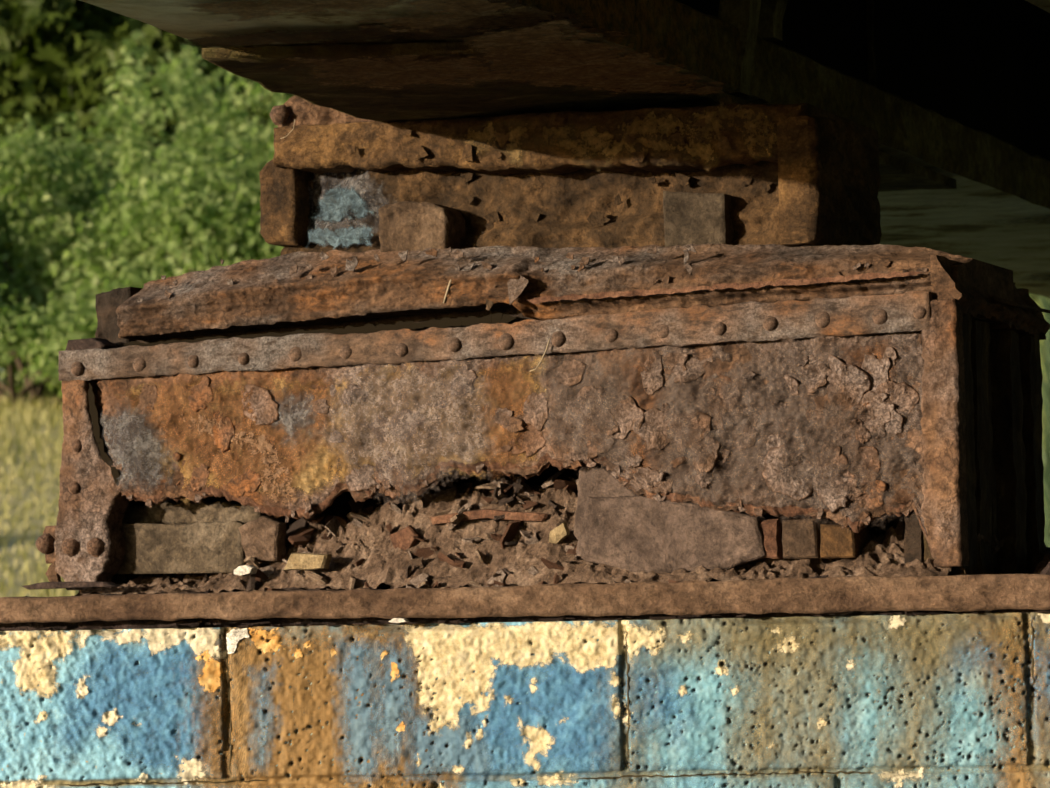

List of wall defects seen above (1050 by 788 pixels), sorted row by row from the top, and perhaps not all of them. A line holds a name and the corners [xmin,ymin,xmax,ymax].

corrosion [65,338,118,351]
crack [117,313,516,348]
corrosion [117,383,330,505]
peeling [345,464,403,499]
corrosion [549,521,570,544]
corrosion [22,561,140,594]
peeling [0,627,227,699]
peeling [404,620,666,749]
peeling [716,660,728,676]
corrosion [159,620,459,788]
peeling [96,708,138,738]
peeling [510,720,576,786]